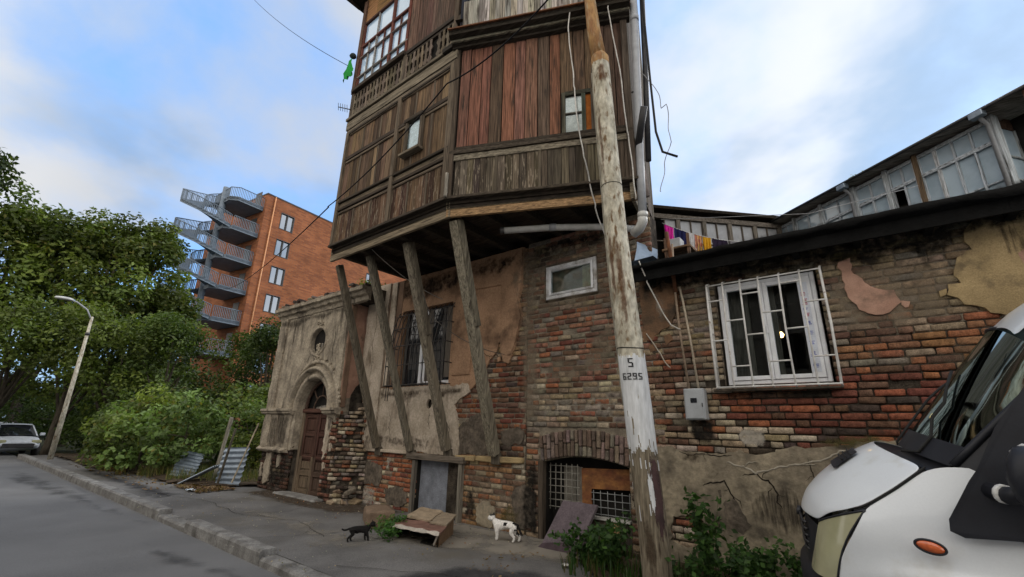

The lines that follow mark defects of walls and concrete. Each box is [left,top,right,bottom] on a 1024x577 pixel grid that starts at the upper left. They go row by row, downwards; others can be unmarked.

peeling [837,258,910,315]
peeling [939,218,1024,315]
crack [679,450,846,509]